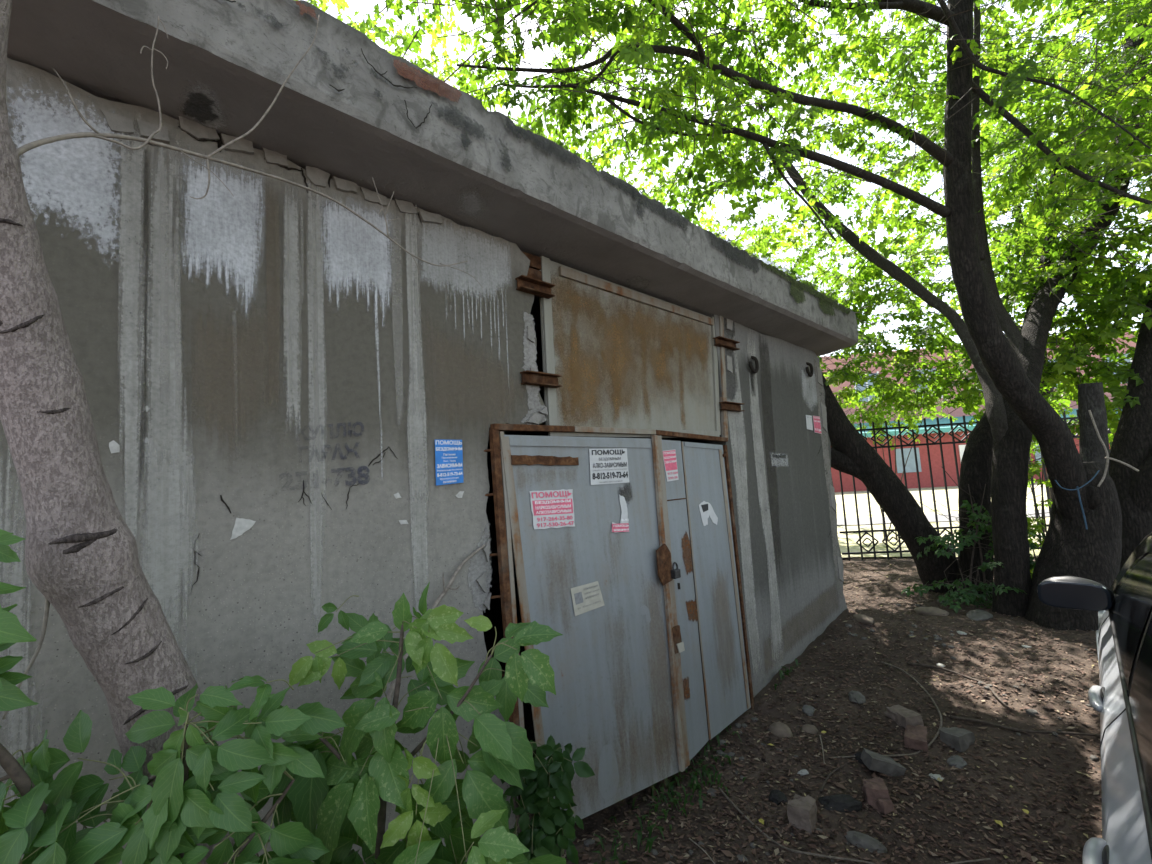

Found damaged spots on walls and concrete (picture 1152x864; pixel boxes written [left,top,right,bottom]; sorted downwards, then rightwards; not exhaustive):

flaking render [393,59,462,102]
spalling [100,87,443,226]
leakage [8,89,263,634]
spalling [521,312,548,425]
leakage [284,180,510,627]
crack [298,446,398,510]
corrosion [619,483,632,501]
corrosion [682,532,693,574]
corrosion [686,600,698,622]